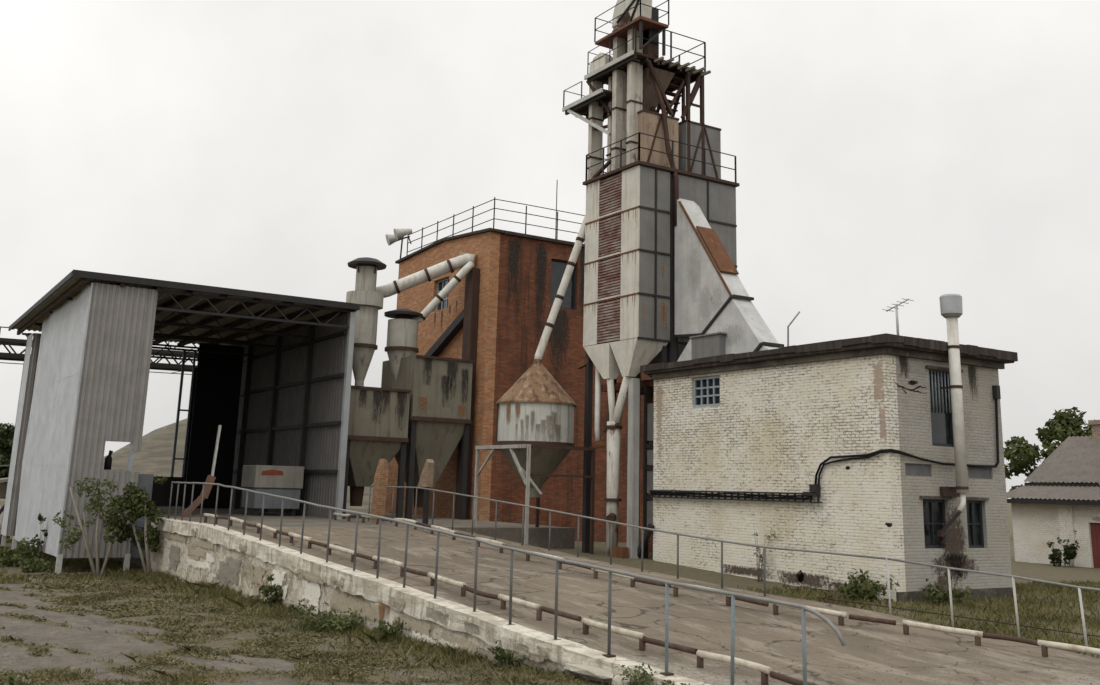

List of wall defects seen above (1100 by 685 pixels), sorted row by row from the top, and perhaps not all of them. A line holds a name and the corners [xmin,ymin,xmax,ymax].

damp [425,358,468,407]
damp [359,390,407,428]
peeling [162,528,498,662]